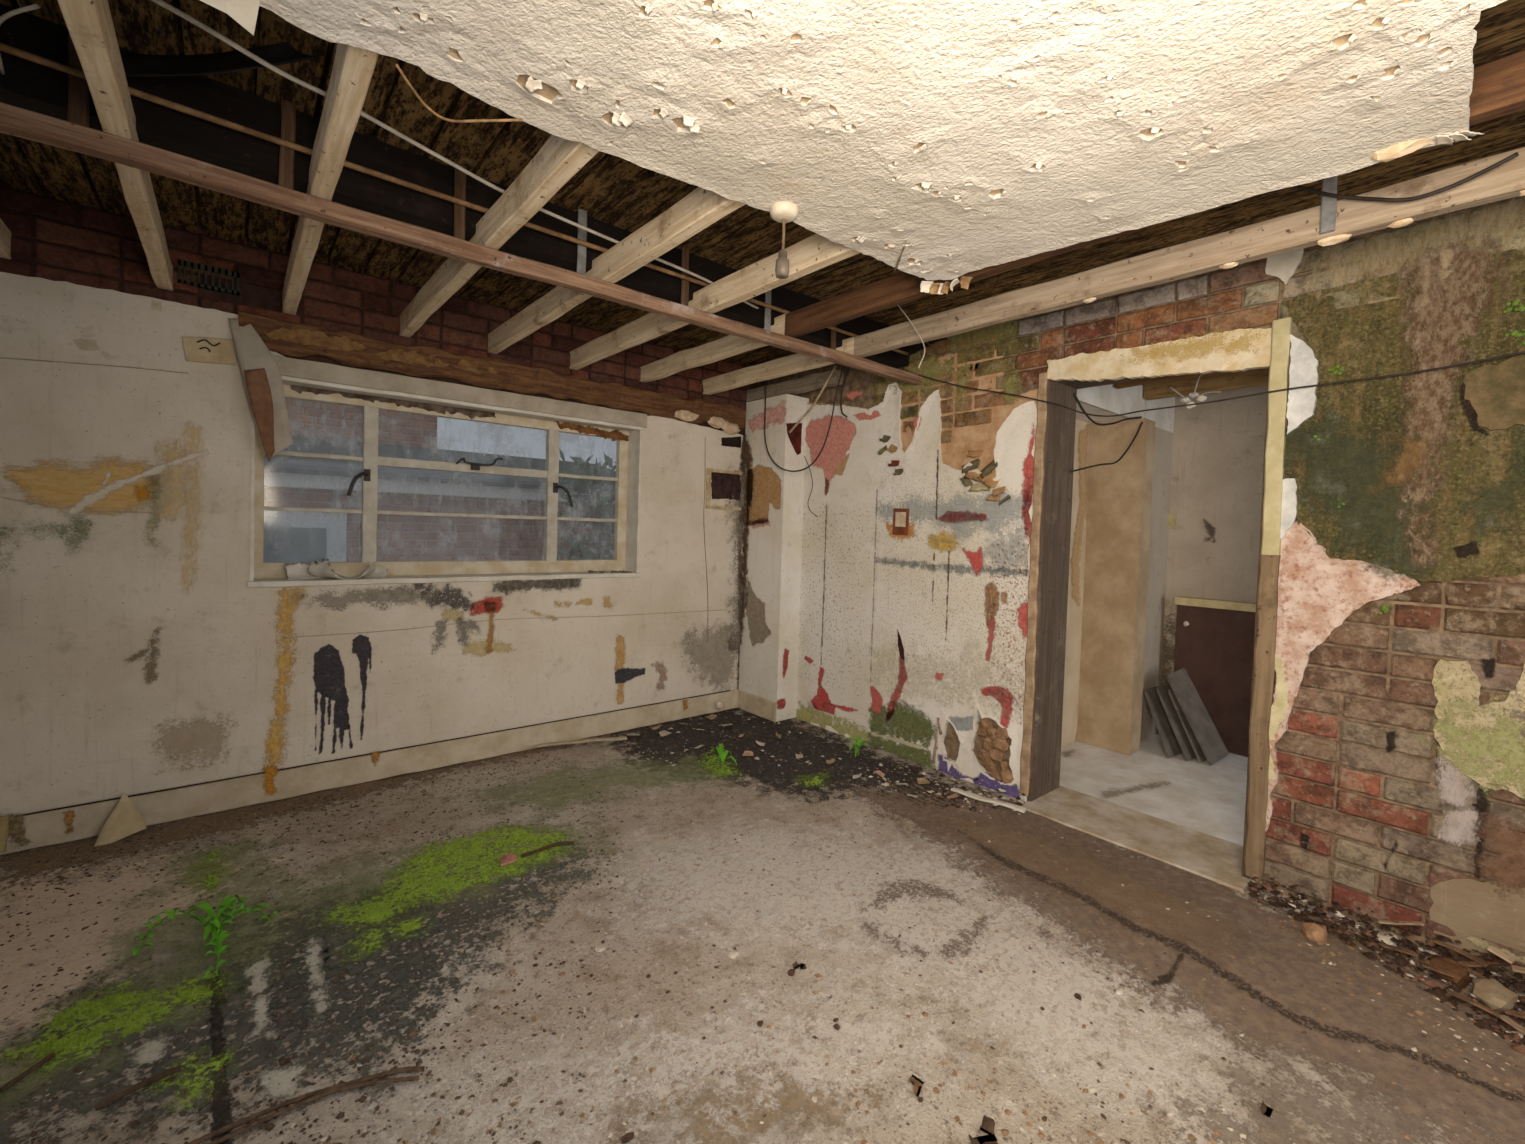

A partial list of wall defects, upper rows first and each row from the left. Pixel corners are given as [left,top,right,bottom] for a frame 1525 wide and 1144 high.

peeling [517,60,587,101]
peeling [602,100,634,142]
peeling [653,108,701,134]
peeling [721,400,786,448]
spalling [746,464,781,525]
peeling [777,196,1525,802]
leakage [1306,196,1525,570]
rust [263,588,305,795]
spalling [745,581,771,646]
spalling [1263,521,1525,943]
leakage [0,835,609,1144]
crack [957,829,1524,1104]